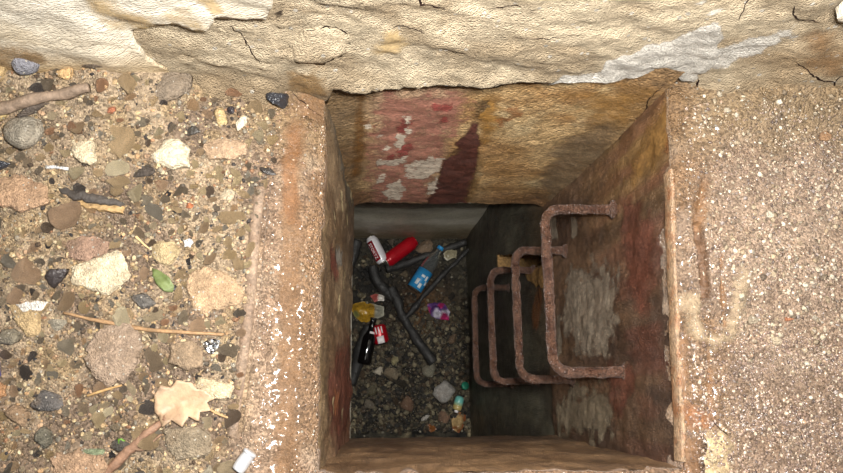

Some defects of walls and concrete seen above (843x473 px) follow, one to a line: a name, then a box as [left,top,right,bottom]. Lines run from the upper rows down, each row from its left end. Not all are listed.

flaking render [133,0,843,202]
crack [796,62,840,86]